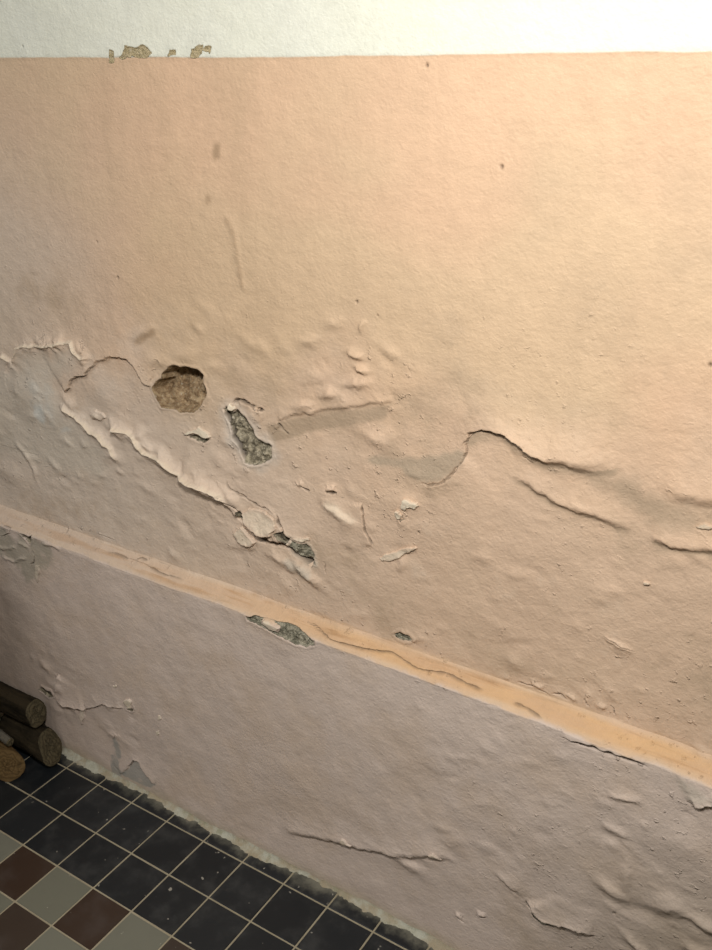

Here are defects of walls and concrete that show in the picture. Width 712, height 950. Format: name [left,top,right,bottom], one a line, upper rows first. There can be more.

peeling [105,36,217,68]
spalling [60,348,344,596]
spalling [0,511,61,595]
spalling [239,603,321,652]
peeling [37,667,136,725]
leakage [105,729,160,793]